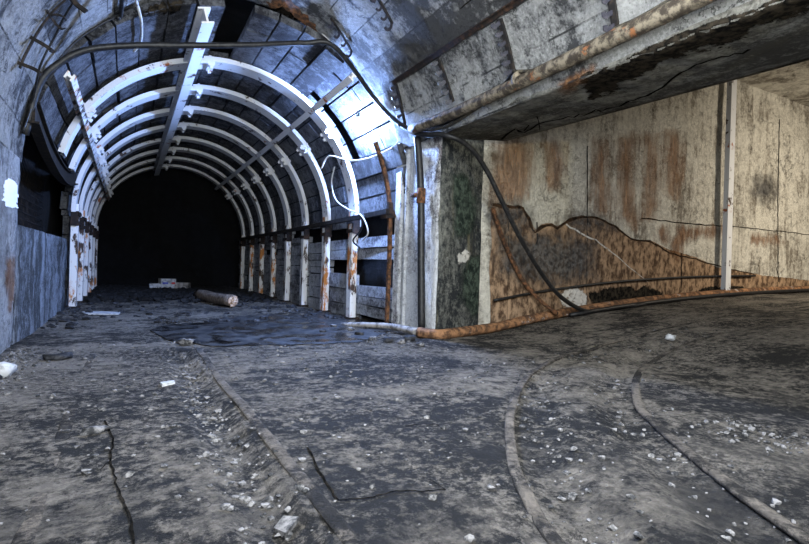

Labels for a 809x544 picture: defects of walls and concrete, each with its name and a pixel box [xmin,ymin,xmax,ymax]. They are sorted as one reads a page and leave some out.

water stain [452,173,477,237]
corrosion [496,145,528,201]
corrosion [619,140,635,225]
spalling [561,285,663,307]